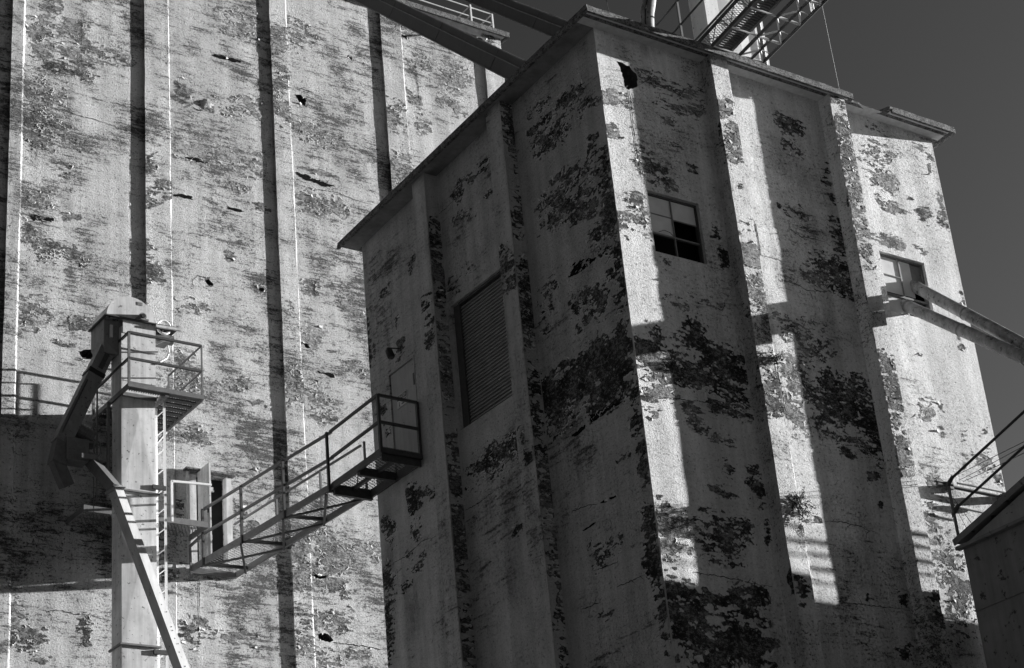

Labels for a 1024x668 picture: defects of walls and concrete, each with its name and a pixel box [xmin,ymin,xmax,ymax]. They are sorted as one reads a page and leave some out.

peeling [20,0,137,271]
peeling [146,139,272,214]
peeling [171,71,345,151]
peeling [295,166,350,224]
spalling [421,61,977,668]
peeling [292,481,435,668]